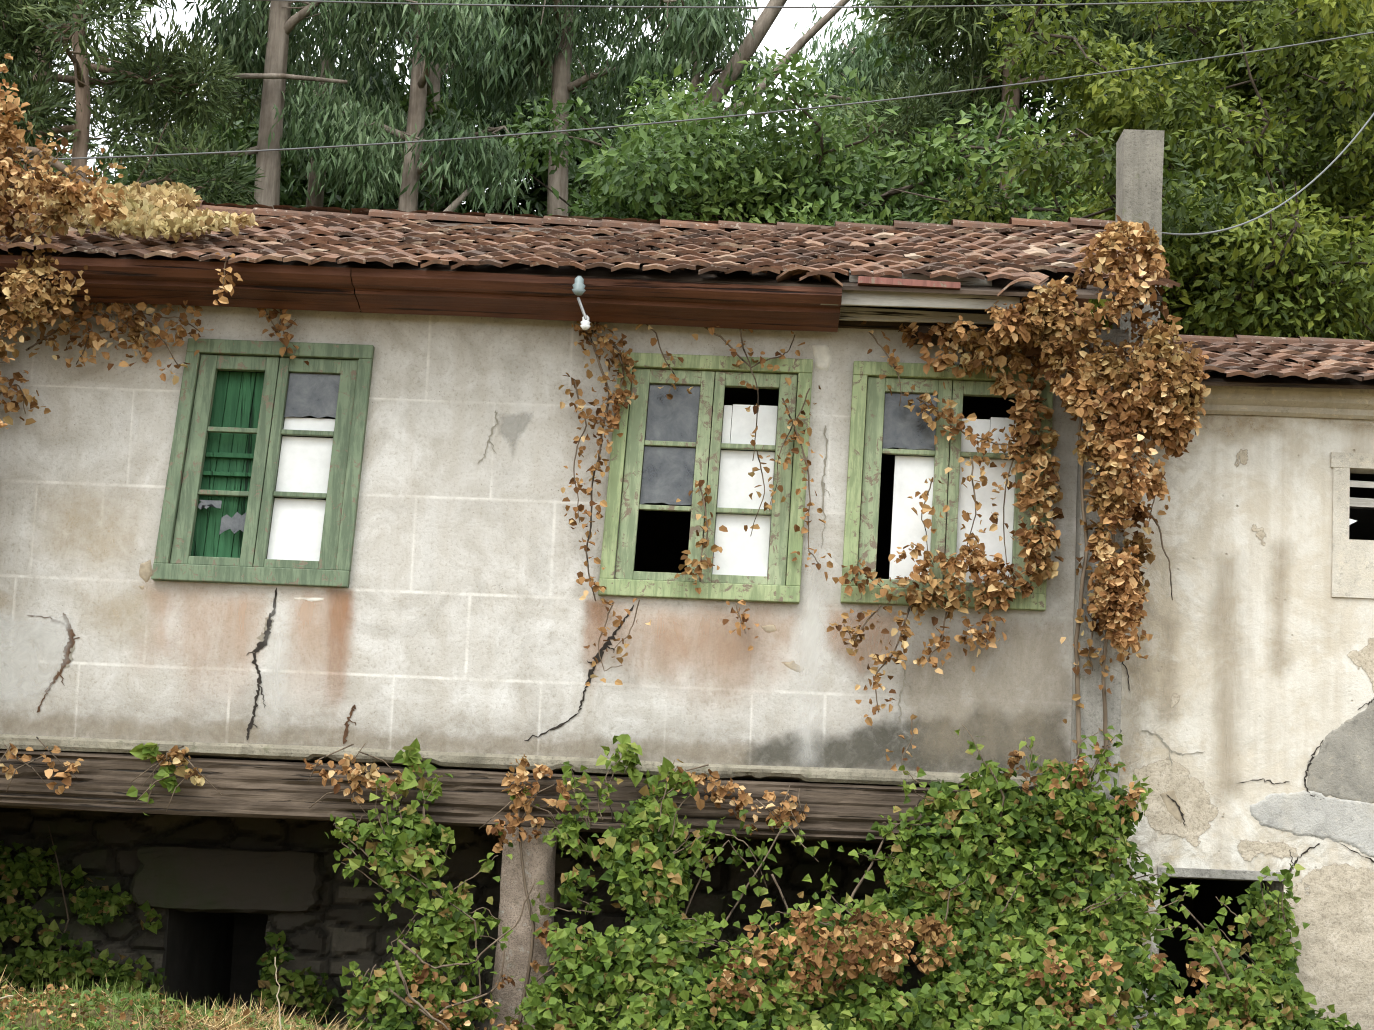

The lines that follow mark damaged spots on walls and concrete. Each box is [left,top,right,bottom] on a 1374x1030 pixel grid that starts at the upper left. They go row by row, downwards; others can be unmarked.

crack [27,613,80,713]
crack [246,588,277,740]
peeling [1348,638,1374,710]
peeling [1134,757,1225,847]
peeling [1238,840,1299,861]
peeling [1283,863,1374,1030]